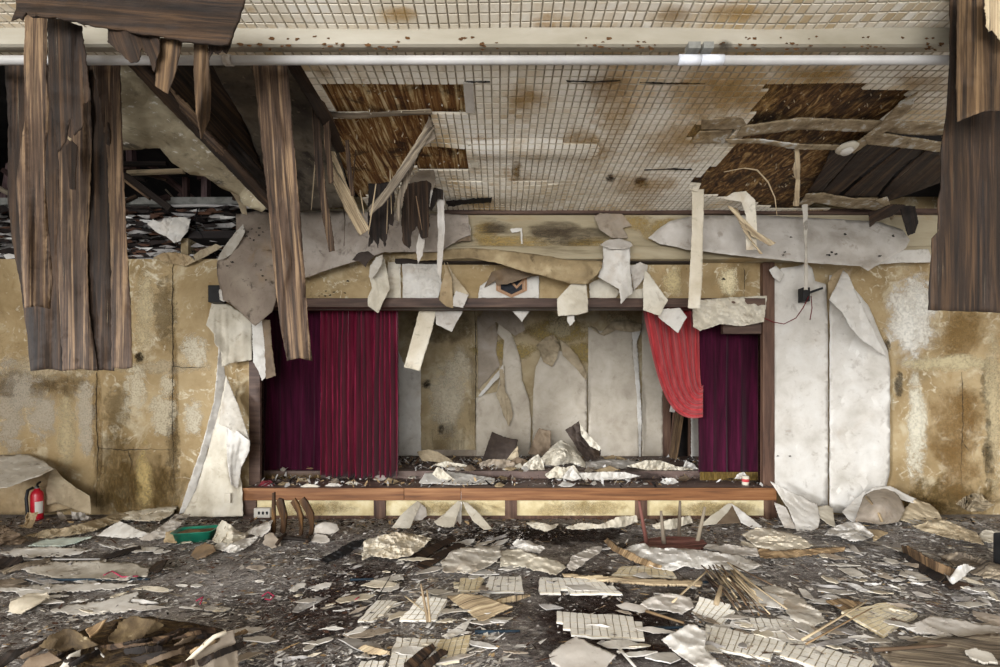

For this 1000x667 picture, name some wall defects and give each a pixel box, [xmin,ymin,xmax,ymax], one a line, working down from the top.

peeling [321,82,469,199]
peeling [300,211,471,278]
peeling [649,82,910,358]
leakage [884,278,935,361]
leakage [0,358,57,452]
leakage [76,375,178,511]
peeling [478,365,504,397]
peeling [632,331,642,457]
leakage [904,479,991,515]